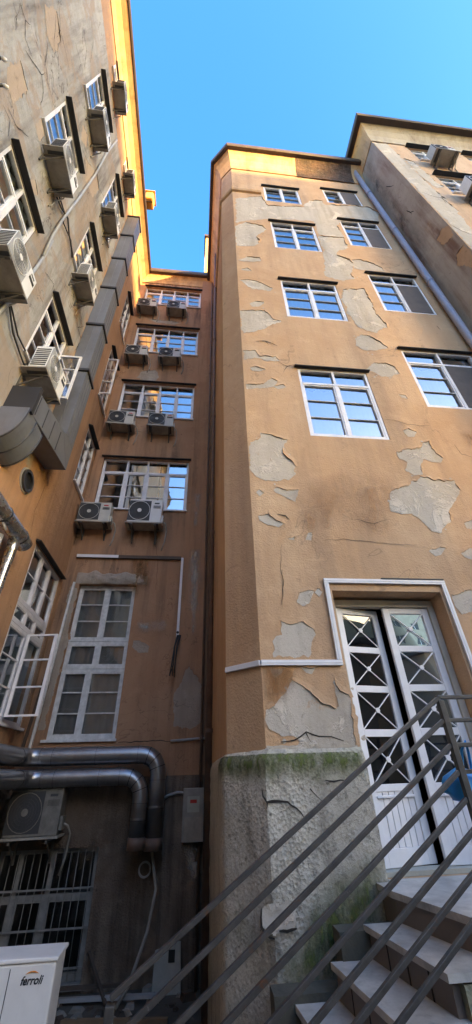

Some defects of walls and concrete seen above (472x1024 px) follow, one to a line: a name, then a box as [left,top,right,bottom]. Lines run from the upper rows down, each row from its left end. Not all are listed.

crack [13,0,93,105]
flaking render [235,196,401,379]
flaking render [249,432,299,502]
flaking render [387,426,472,556]
flaking render [265,583,366,750]
crack [262,780,344,817]